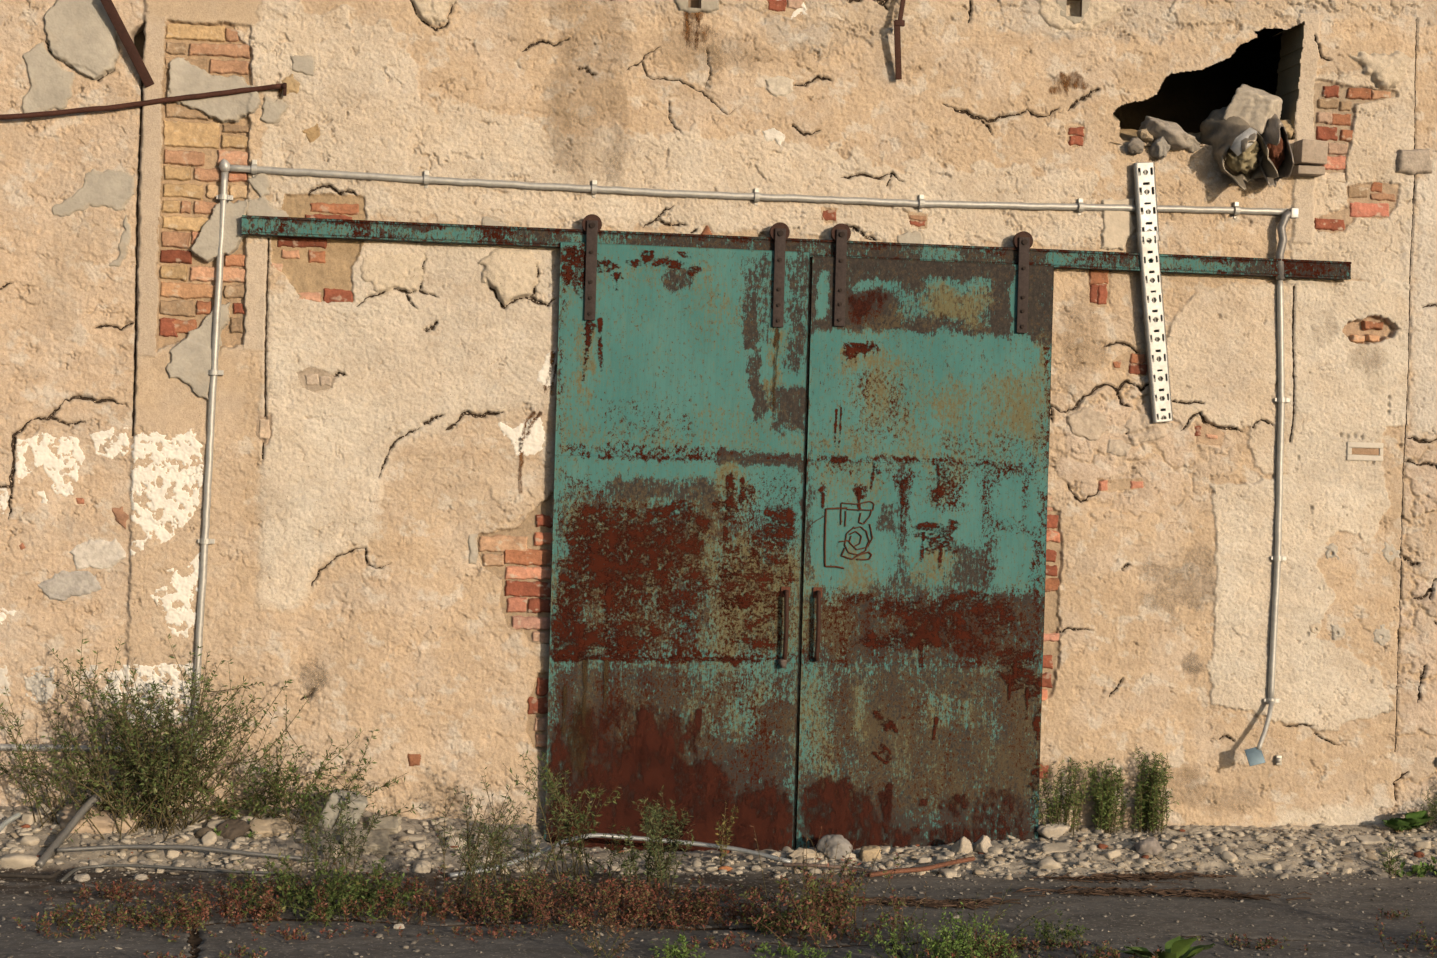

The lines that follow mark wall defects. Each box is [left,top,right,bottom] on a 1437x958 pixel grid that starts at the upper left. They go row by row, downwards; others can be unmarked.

spalling [155,20,252,351]
spalling [1313,81,1398,233]
crack [0,43,143,519]
peeling [0,427,204,555]
crack [379,411,503,477]
rust [830,407,848,464]
rust [843,342,875,363]
crack [1050,286,1295,442]
crack [1393,19,1437,800]
peeling [150,552,201,638]
spalling [477,492,554,646]
rust [546,457,1042,877]